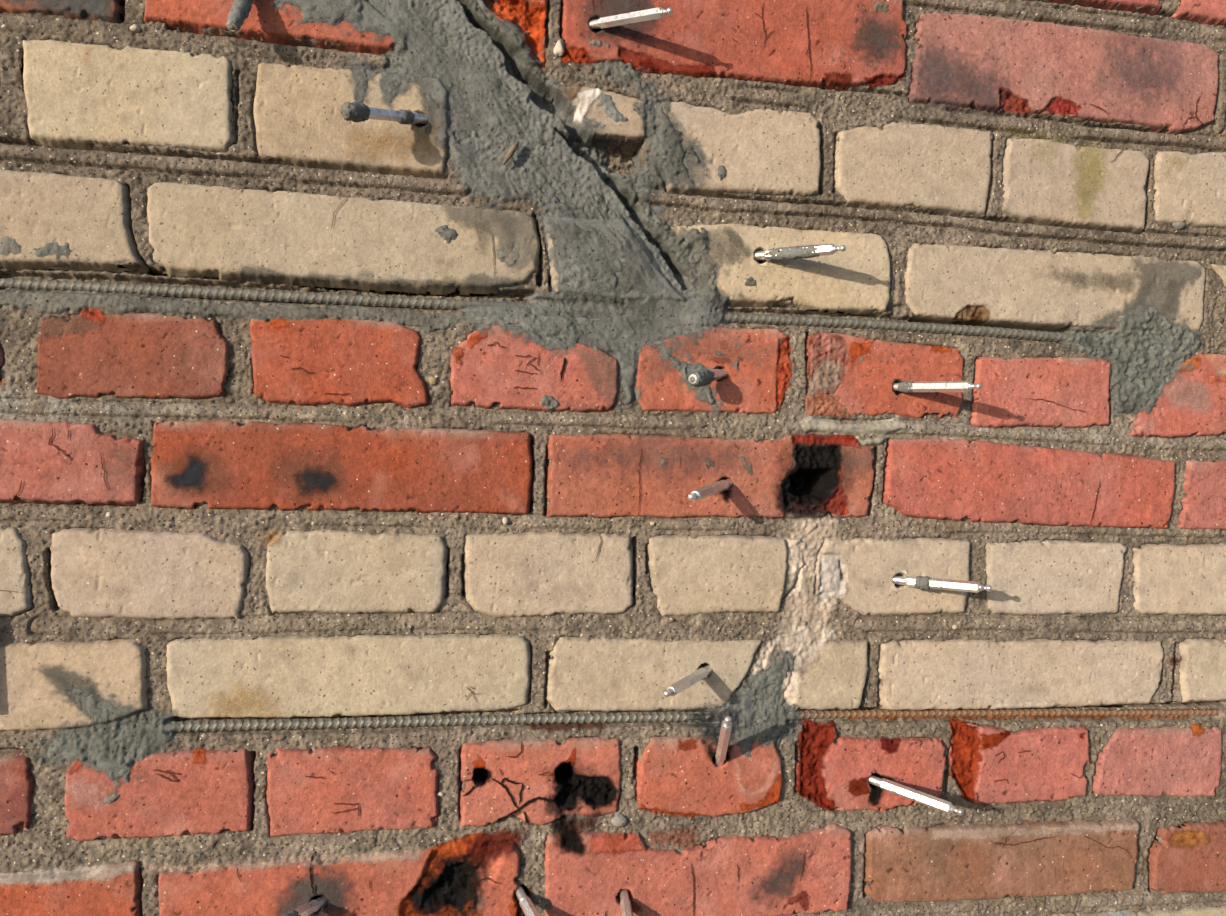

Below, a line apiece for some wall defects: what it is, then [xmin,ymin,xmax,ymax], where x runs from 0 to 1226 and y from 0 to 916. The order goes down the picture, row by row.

crack [475,208,495,277]
crack [49,428,110,490]
spalling [791,434,859,448]
spalling [813,470,848,516]
leakage [751,514,848,706]
crack [462,741,556,826]
spalling [740,774,782,811]
spalling [796,719,836,810]
spalling [848,778,869,796]
spalling [880,738,901,754]
spalling [949,718,1010,801]
rust [466,830,521,866]